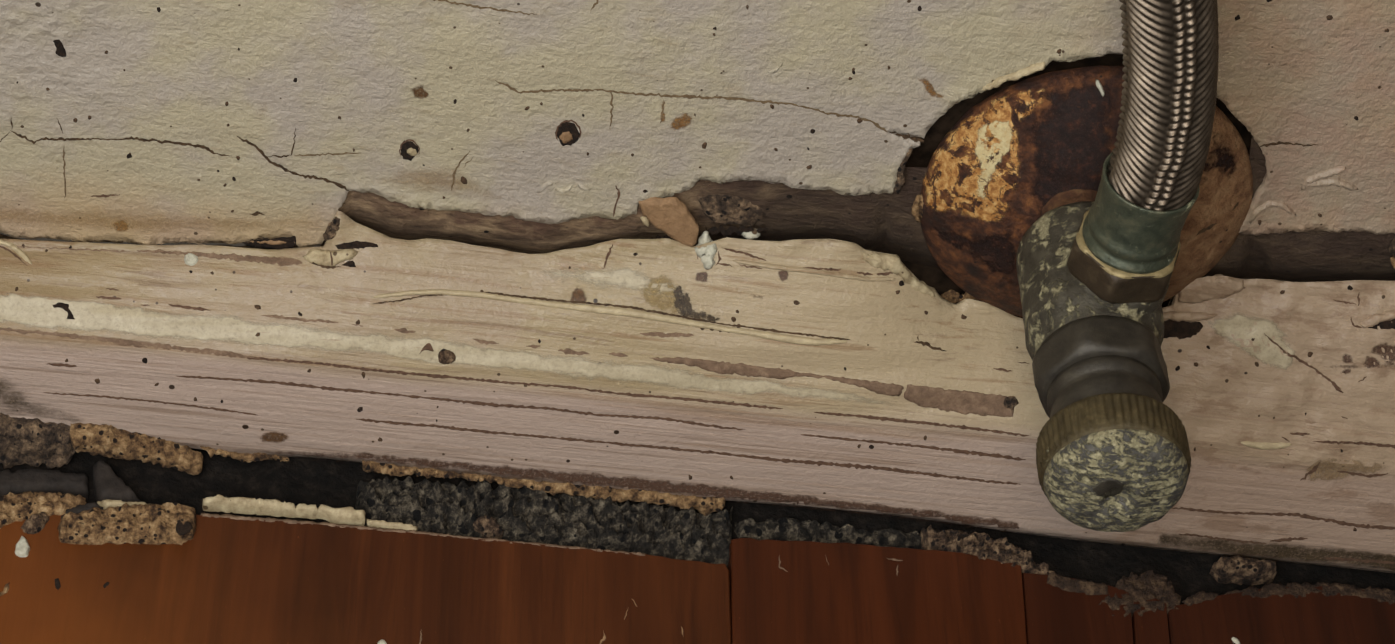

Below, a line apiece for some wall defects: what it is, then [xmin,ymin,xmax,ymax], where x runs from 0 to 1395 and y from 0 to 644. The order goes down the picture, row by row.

crack [495,80,924,143]
rust [920,79,942,97]
spalling [894,54,1124,194]
spalling [1216,97,1252,155]
crack [0,119,359,198]
crack [451,151,473,191]
rust [924,86,1113,283]
rust [1204,136,1235,179]
crack [603,186,620,269]
crack [697,248,766,269]
crack [803,267,893,276]
crack [1333,294,1363,328]